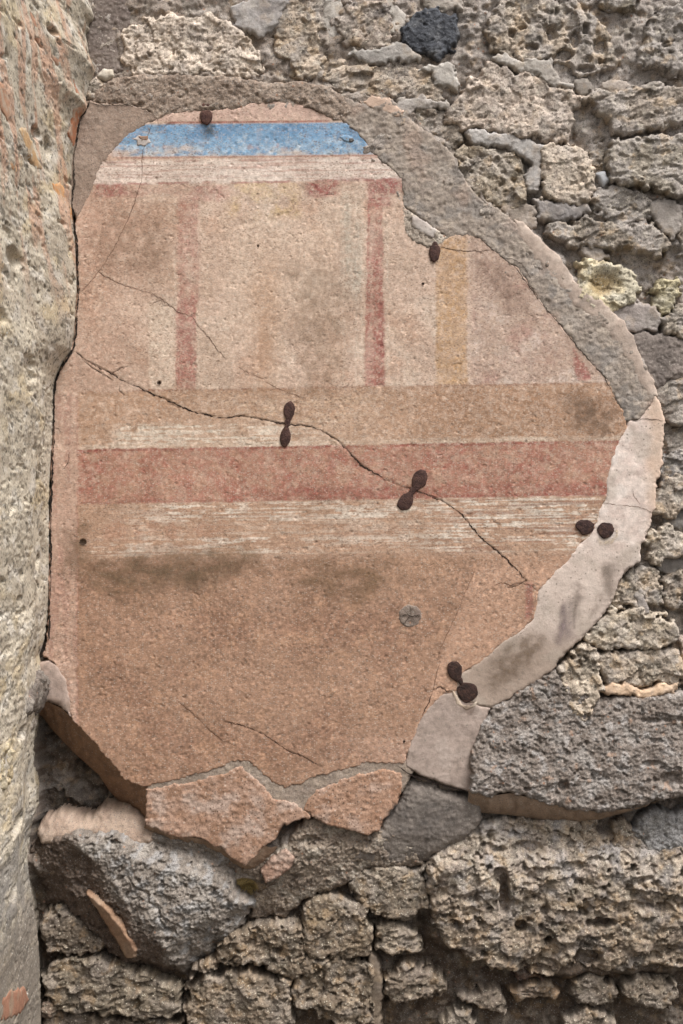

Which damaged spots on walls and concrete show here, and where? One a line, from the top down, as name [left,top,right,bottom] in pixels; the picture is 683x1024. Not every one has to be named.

crack [48,100,535,715]
spalling [452,690,477,710]